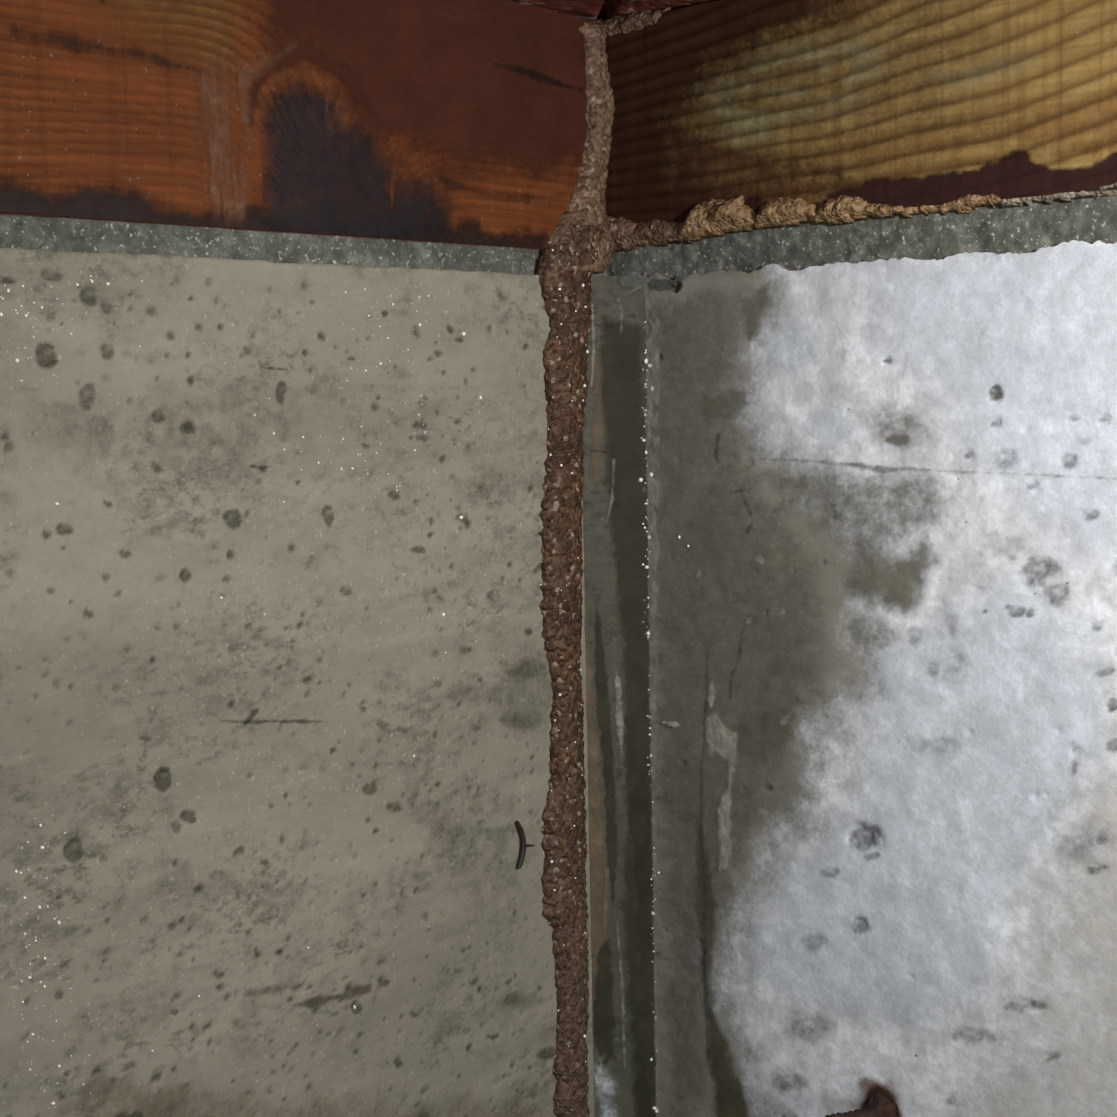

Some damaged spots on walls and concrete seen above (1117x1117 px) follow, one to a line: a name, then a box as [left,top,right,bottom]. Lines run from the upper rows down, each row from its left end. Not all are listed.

leakage [0,0,1117,248]
leakage [591,240,1117,1117]
rust [861,1078,901,1117]